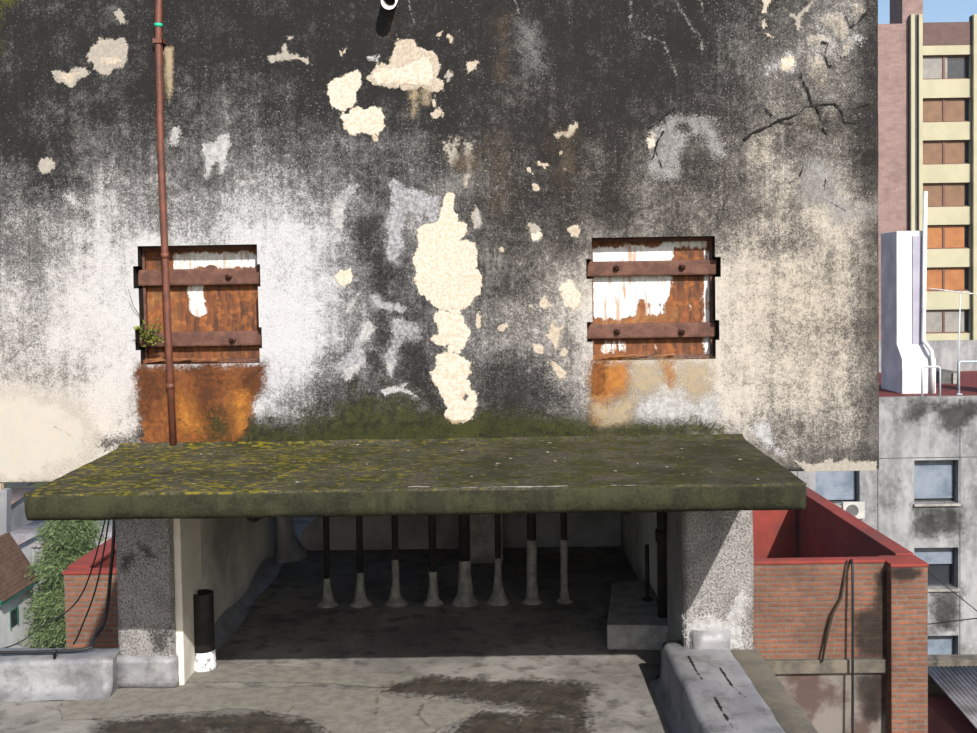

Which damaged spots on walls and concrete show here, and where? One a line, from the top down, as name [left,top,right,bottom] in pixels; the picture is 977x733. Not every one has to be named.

peeling [51,37,129,88]
peeling [202,133,256,187]
peeling [267,36,309,65]
peeling [327,38,453,142]
peeling [555,122,578,139]
spalling [637,114,727,180]
crack [743,71,868,140]
peeling [328,136,483,424]
corrosion [133,363,266,443]
corrosion [589,358,713,429]
efflorescence [628,385,724,428]
water stain [907,400,977,433]